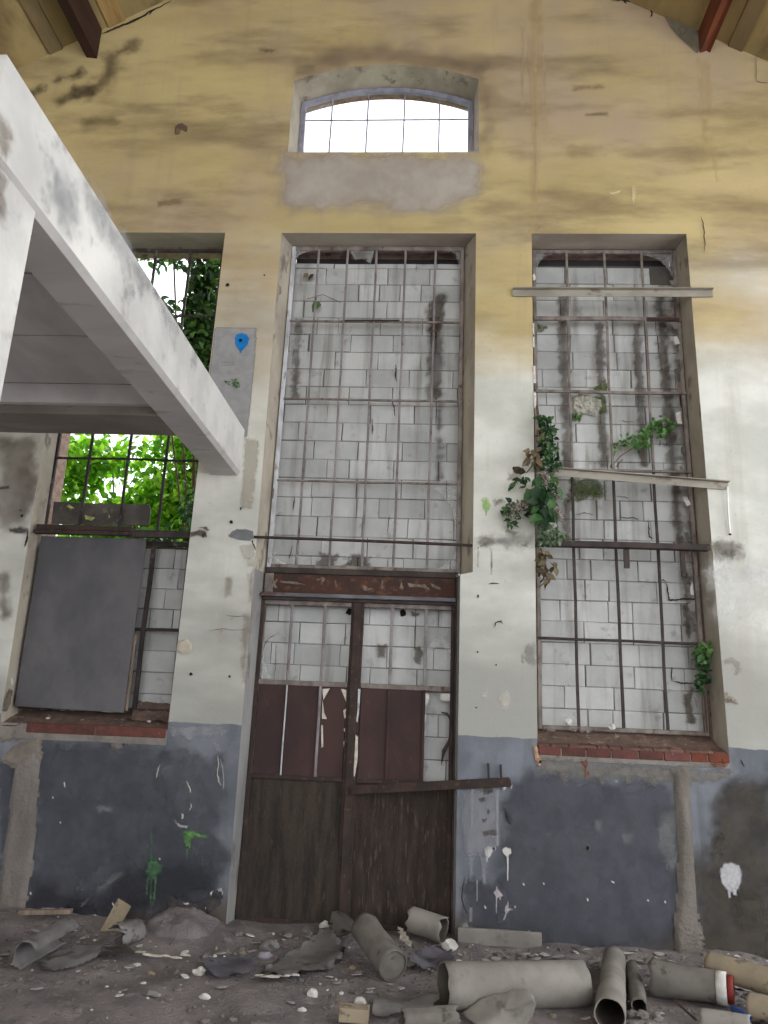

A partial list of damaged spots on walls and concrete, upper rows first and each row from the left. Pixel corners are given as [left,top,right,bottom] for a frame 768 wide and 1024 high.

water stain [1,456,36,533]
water stain [711,541,741,560]
water stain [28,726,228,917]